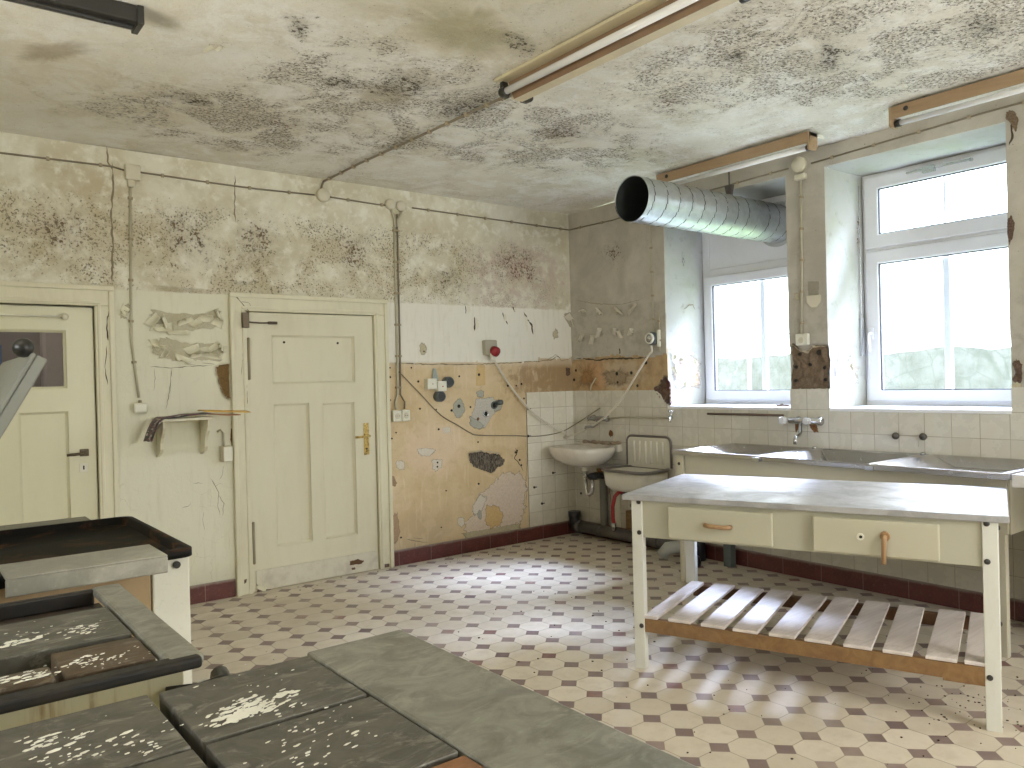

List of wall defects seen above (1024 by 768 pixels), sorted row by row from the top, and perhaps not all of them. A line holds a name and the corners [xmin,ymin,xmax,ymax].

leakage [821,39,850,69]
leakage [321,69,496,115]
leakage [44,213,85,247]
crack [106,150,114,280]
leakage [164,212,207,256]
leakage [241,222,279,265]
flaking render [1007,216,1015,245]
peeling [143,308,231,400]
peeling [654,348,701,407]
flaking render [791,343,830,389]
flaking render [1011,359,1023,387]
peeling [457,441,528,538]